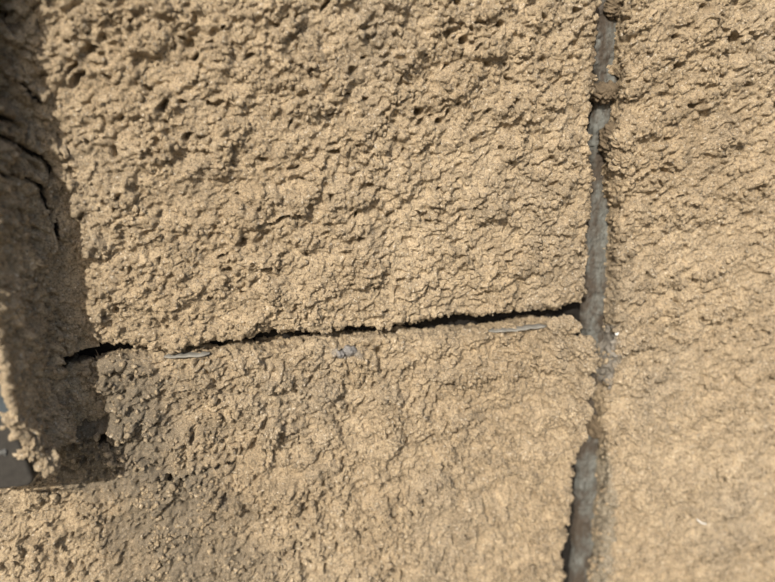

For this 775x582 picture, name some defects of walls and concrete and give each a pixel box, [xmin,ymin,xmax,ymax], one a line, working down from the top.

crack [0,115,60,240]
crack [99,433,133,449]
crack [159,461,236,482]